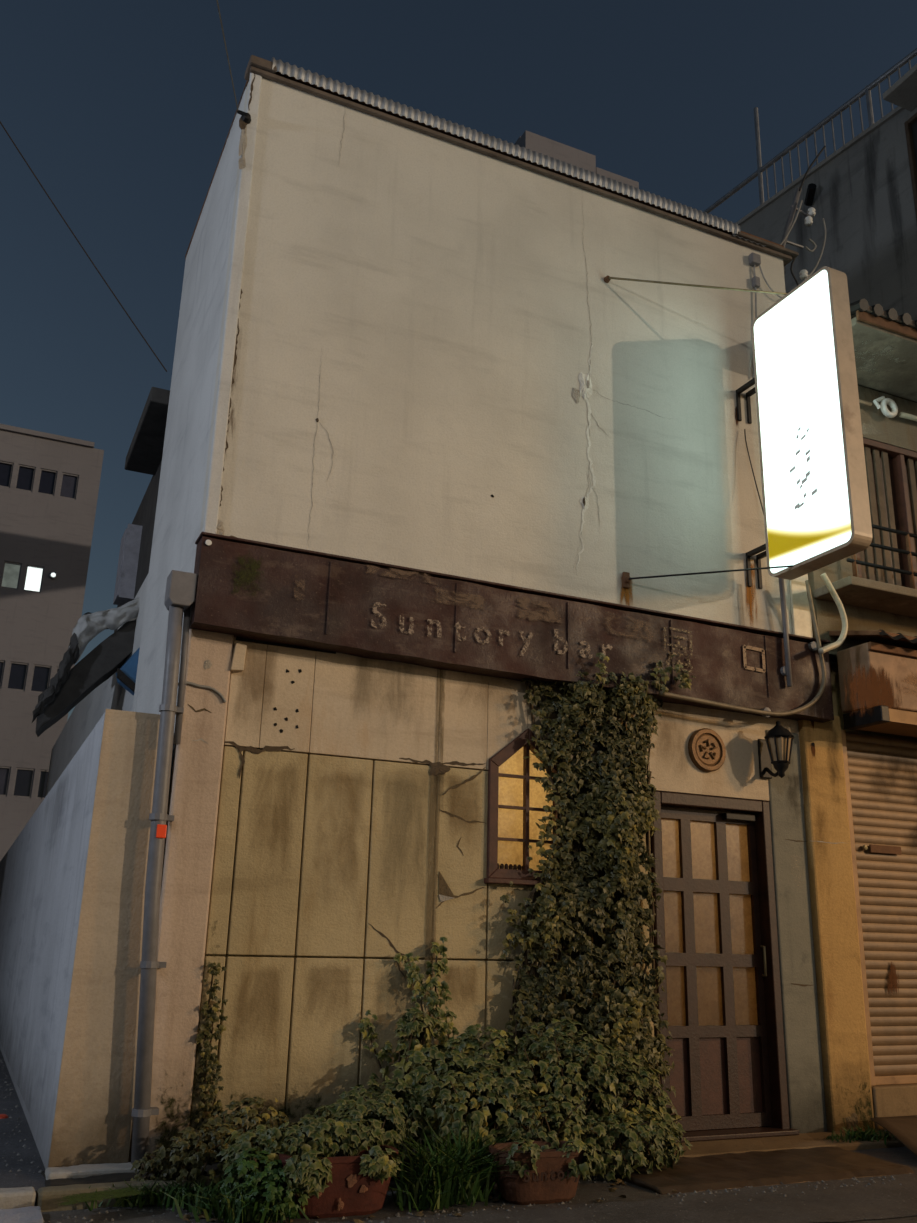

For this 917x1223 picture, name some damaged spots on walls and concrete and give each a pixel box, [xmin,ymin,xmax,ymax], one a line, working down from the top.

crack [308,348,334,546]
crack [573,204,663,575]
corrosion [620,578,633,606]
corrosion [746,564,757,623]
damp [425,669,445,971]
crack [399,758,486,908]